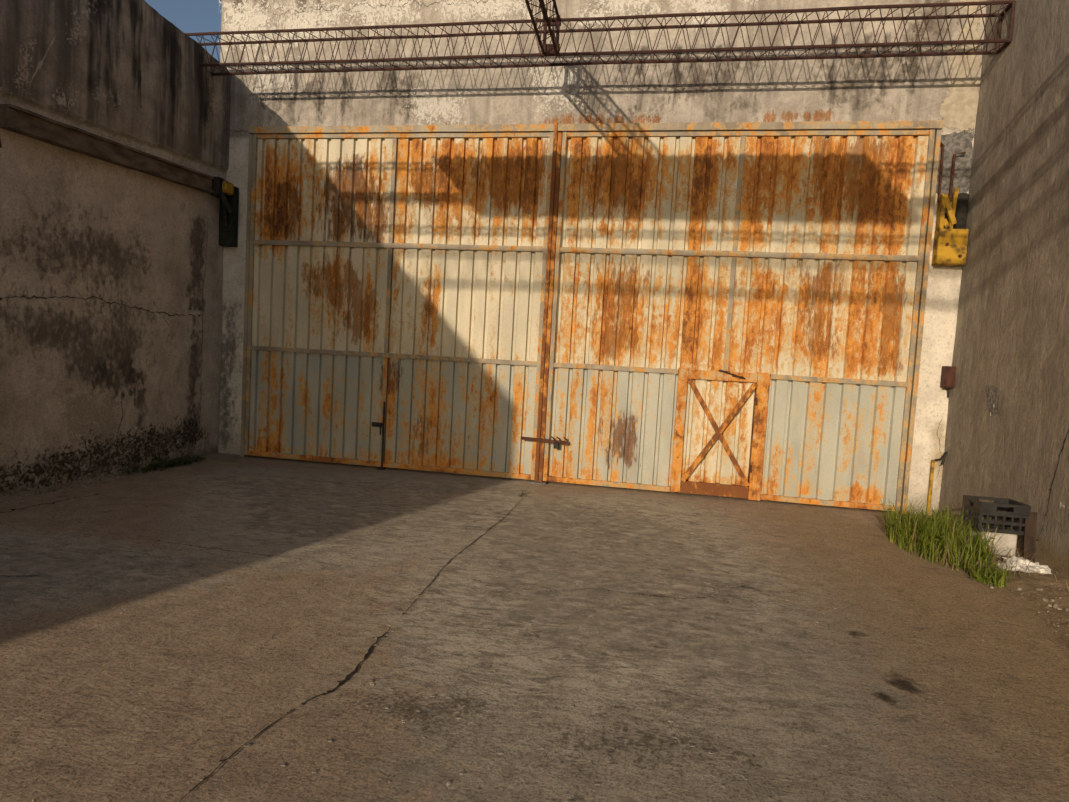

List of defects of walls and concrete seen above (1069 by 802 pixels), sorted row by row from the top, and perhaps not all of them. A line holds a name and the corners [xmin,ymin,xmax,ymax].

leakage [275,77,325,107]
leakage [676,53,738,93]
corrosion [472,138,549,214]
corrosion [809,136,892,218]
corrosion [304,154,390,342]
leakage [0,307,146,424]
crack [0,295,204,341]
leakage [188,218,205,443]
corrosion [592,263,649,360]
corrosion [802,263,841,361]
corrosion [600,414,636,469]
crack [179,494,526,802]